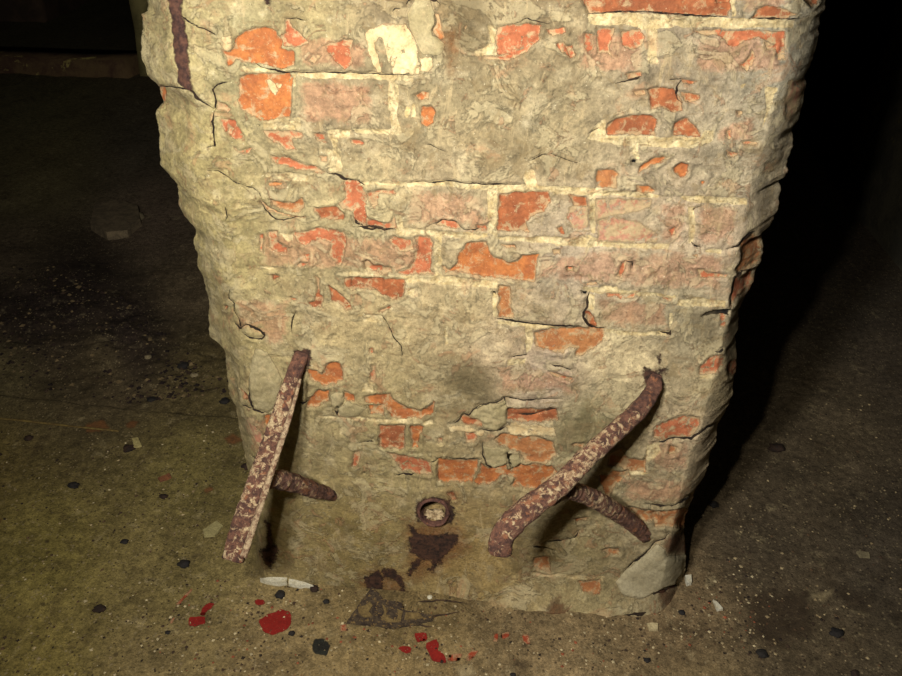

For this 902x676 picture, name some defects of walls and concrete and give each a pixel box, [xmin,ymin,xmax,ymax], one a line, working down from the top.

corrosion [168,0,193,91]
crack [158,81,231,147]
spalling [217,19,327,173]
spalling [606,79,700,137]
crack [406,178,521,186]
spalling [259,180,551,318]
crack [497,291,602,328]
corrosion [293,348,312,375]
spalling [307,362,559,500]
crack [397,396,563,475]
corrosion [259,520,278,569]
corrosion [364,497,458,592]